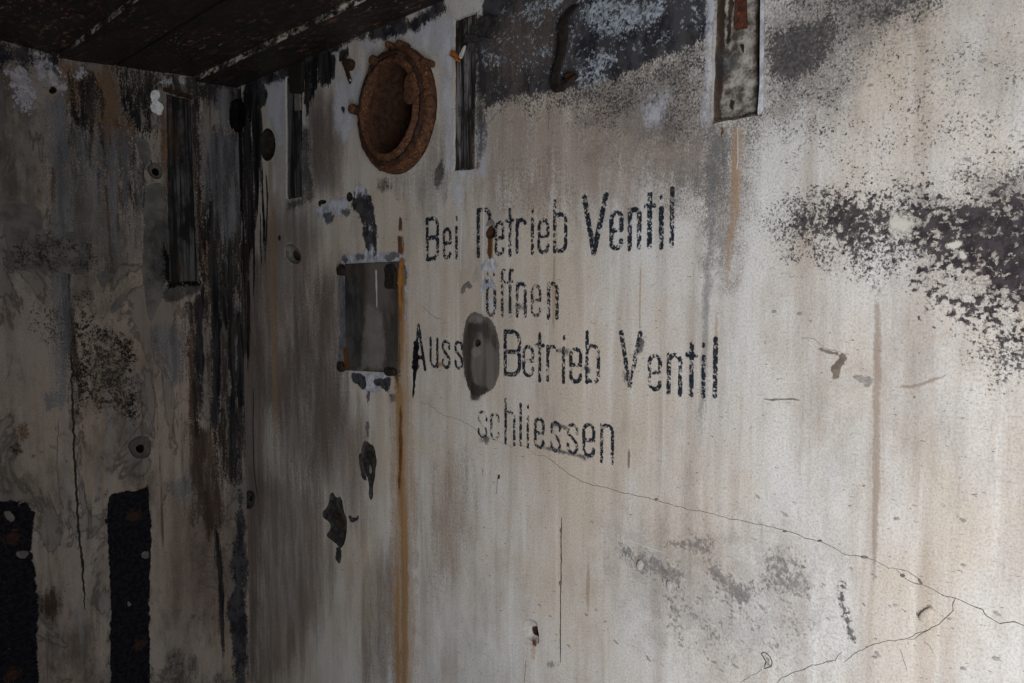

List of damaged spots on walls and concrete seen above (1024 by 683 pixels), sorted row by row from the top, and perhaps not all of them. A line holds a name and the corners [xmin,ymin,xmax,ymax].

crack [56,274,86,610]
leakage [200,128,357,677]
spalling [322,492,359,563]
peeling [323,185,409,405]
spalling [359,422,377,500]
rust [395,217,407,683]
leakage [481,0,709,154]
crack [423,403,1024,683]
leakage [748,0,1024,396]